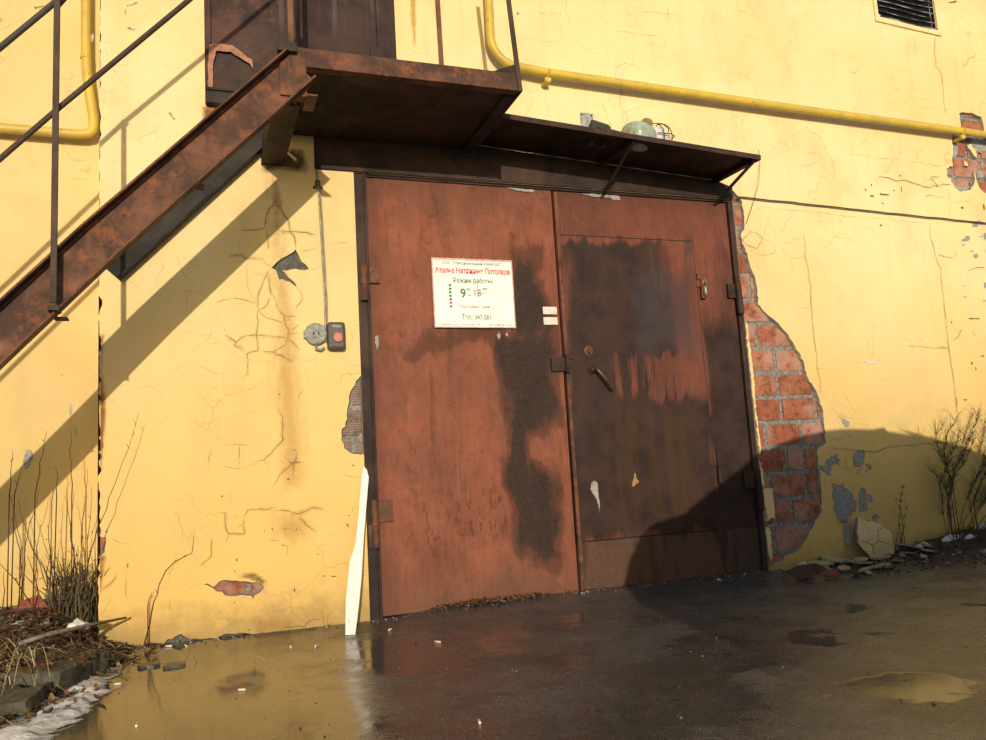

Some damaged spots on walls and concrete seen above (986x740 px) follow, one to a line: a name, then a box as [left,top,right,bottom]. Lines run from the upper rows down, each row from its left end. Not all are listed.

spalling [947,112,986,258]
crack [189,195,316,483]
spalling [272,249,309,287]
spalling [341,377,363,466]
spalling [732,191,879,567]
spalling [201,558,264,603]